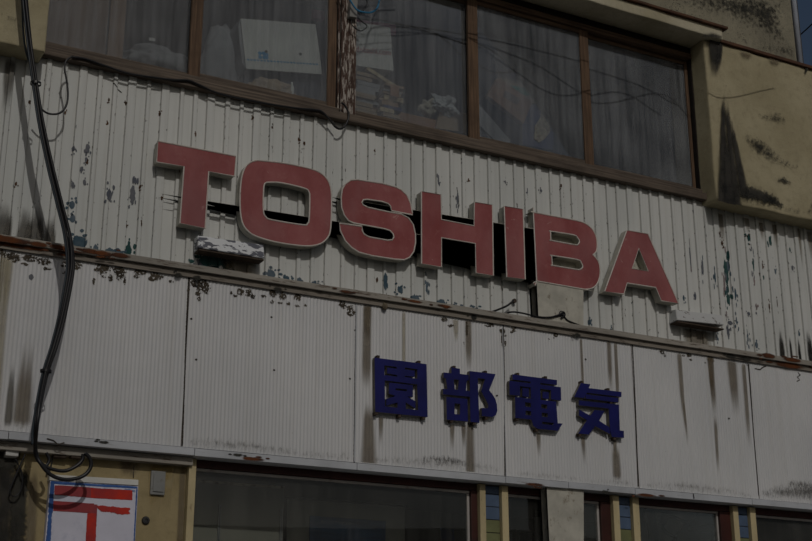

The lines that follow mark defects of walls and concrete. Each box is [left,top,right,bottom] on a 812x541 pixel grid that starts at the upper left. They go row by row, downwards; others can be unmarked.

damp [704,33,722,71]
damp [718,103,782,208]
peeling [65,142,137,254]
peeling [128,176,139,208]
peeling [188,255,234,271]
peeling [263,266,323,284]
peeling [689,231,759,349]
damp [780,335,812,361]
damp [5,375,30,423]
damp [723,354,751,420]
damp [363,414,383,463]
damp [0,451,36,541]